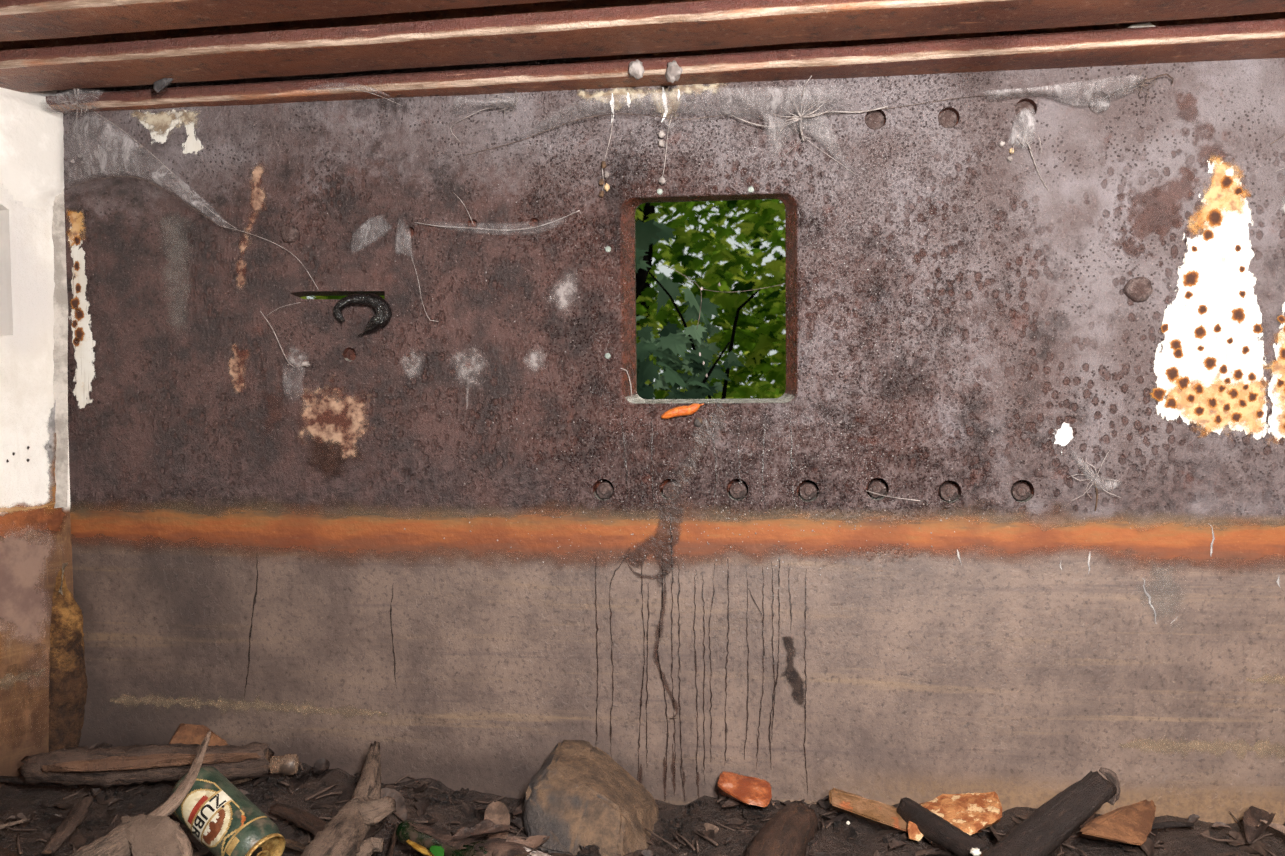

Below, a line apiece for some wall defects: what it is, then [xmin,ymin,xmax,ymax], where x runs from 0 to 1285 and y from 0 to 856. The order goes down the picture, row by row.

peeling [132,109,203,154]
corrosion [236,165,266,287]
peeling [67,211,96,409]
corrosion [228,344,250,392]
peeling [1150,157,1285,441]
flaking render [6,401,56,498]
corrosion [265,388,369,476]
corrosion [0,502,1285,567]
leakage [595,409,729,801]
leakage [744,559,808,795]